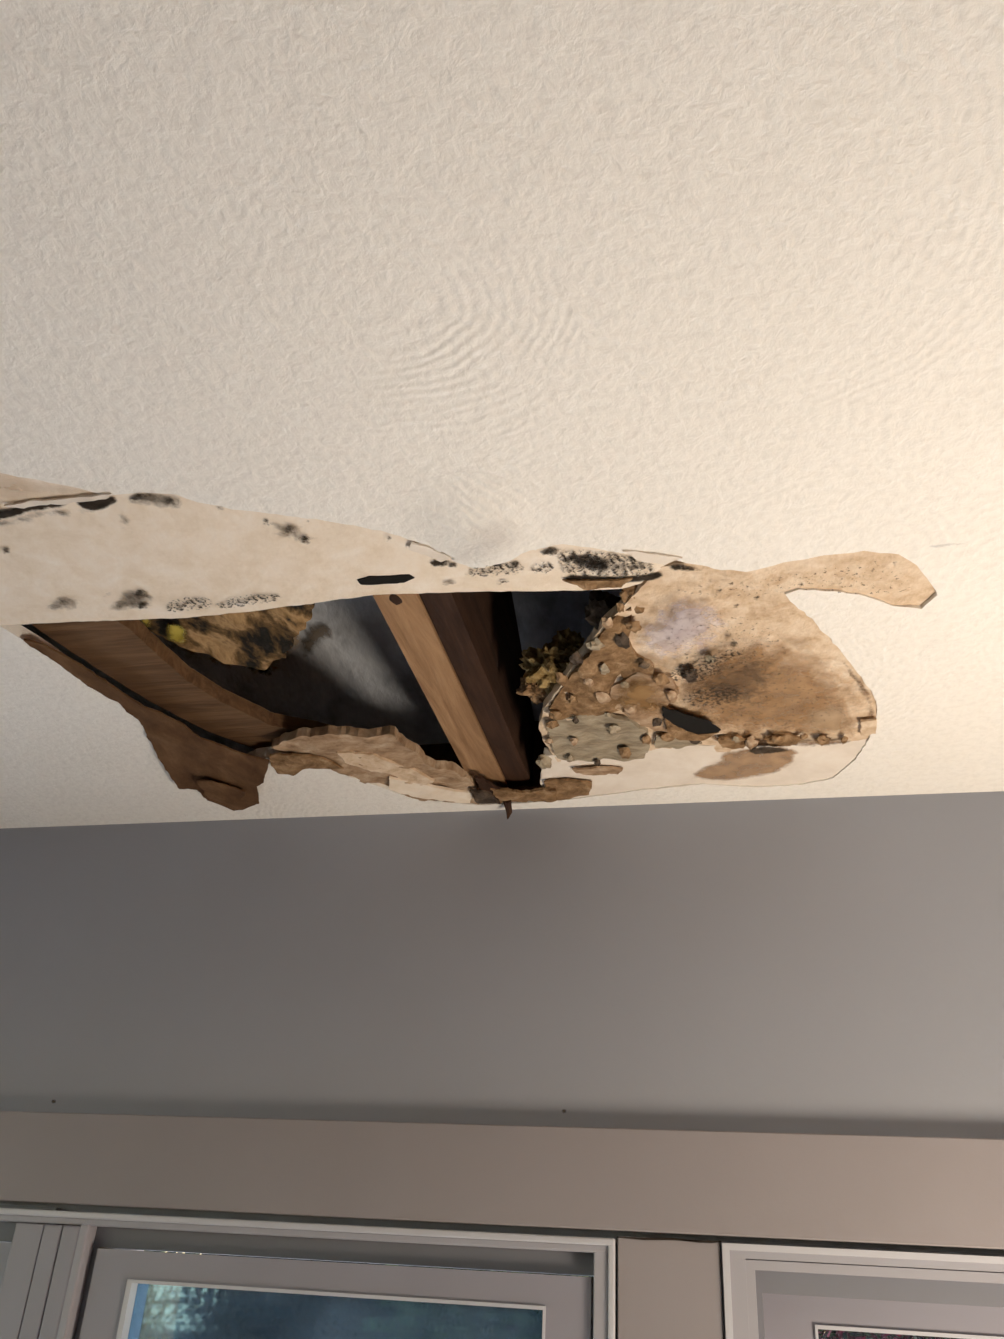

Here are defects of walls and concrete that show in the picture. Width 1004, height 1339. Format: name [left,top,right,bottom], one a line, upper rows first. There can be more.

peeling [0,473,936,803]